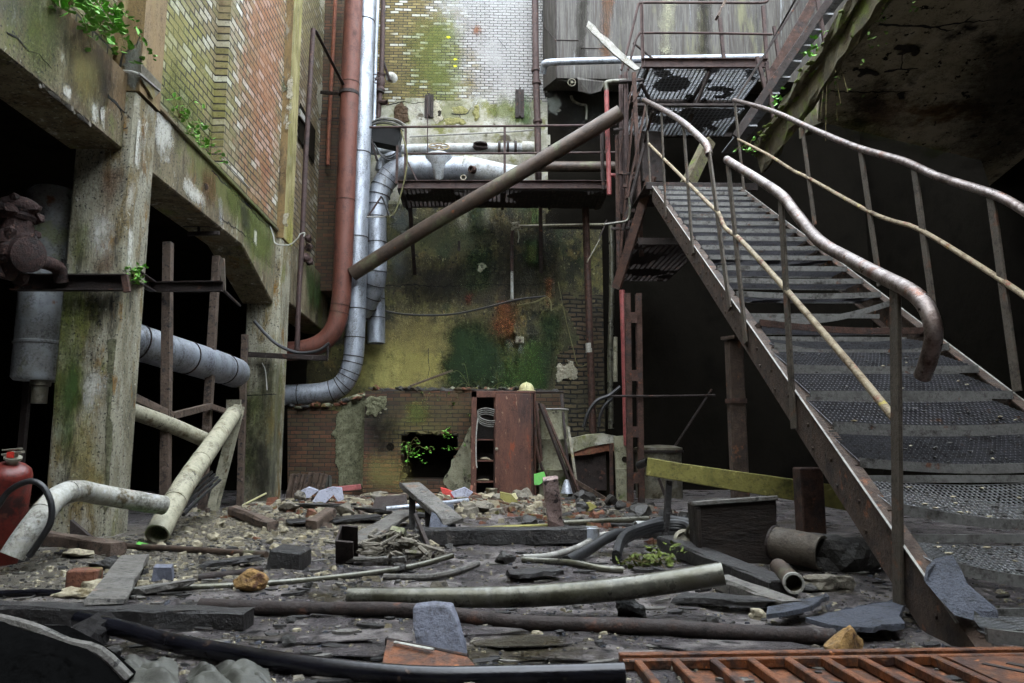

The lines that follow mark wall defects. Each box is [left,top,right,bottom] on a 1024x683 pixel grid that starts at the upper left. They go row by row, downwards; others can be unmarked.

crack [831,55,918,93]
efflorescence [184,181,203,203]
spalling [556,360,578,382]
spalling [331,386,418,487]
spalling [397,427,471,491]